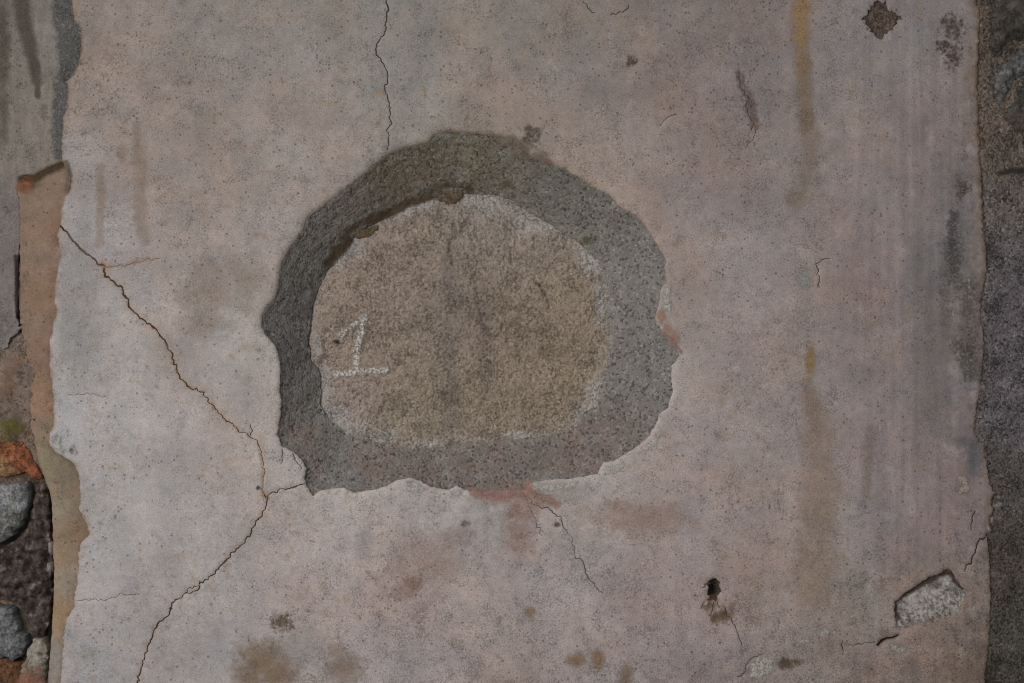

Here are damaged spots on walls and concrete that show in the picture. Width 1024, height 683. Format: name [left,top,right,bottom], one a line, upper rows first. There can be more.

leakage [15,0,40,98]
leakage [52,0,81,159]
crack [375,0,392,150]
spalling [862,1,902,39]
spalling [262,132,679,496]
crack [59,225,303,683]
peeling [47,541,55,573]
crack [521,491,603,593]
spalling [877,569,966,645]